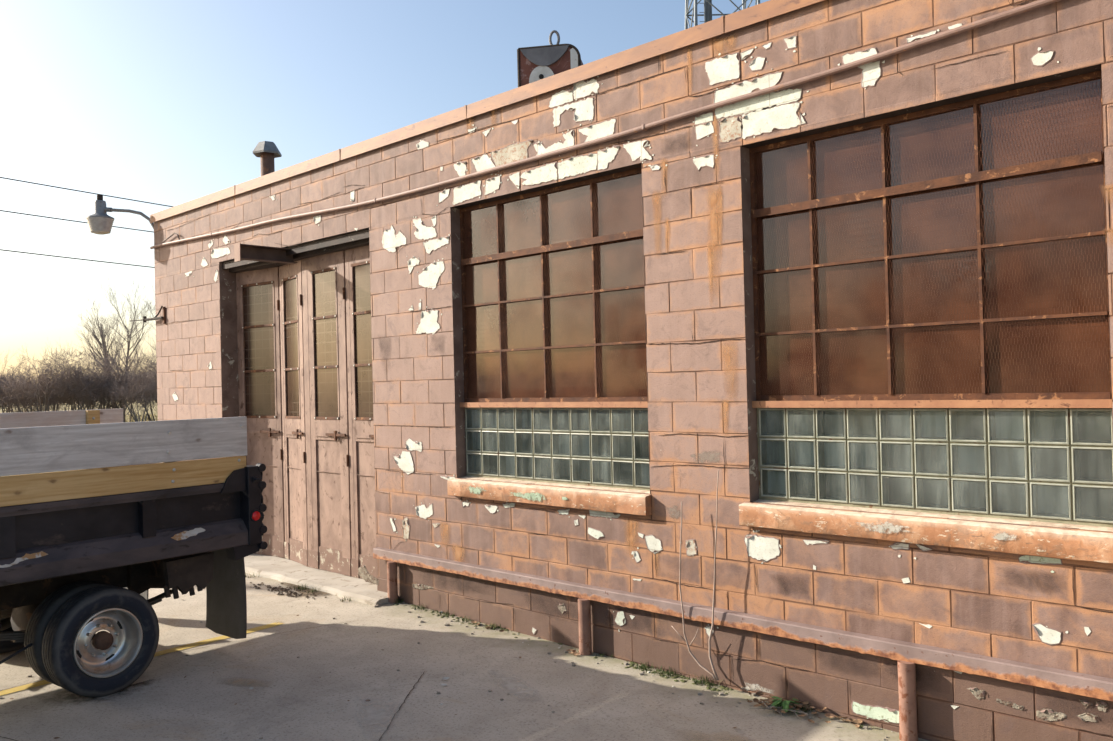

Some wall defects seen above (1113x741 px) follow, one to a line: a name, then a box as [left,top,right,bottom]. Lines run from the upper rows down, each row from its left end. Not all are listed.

peeling [692,36,809,171]
peeling [382,76,667,335]
peeling [393,438,424,477]
peeling [744,530,782,563]
peeling [1032,623,1068,646]
peeling [851,701,899,724]